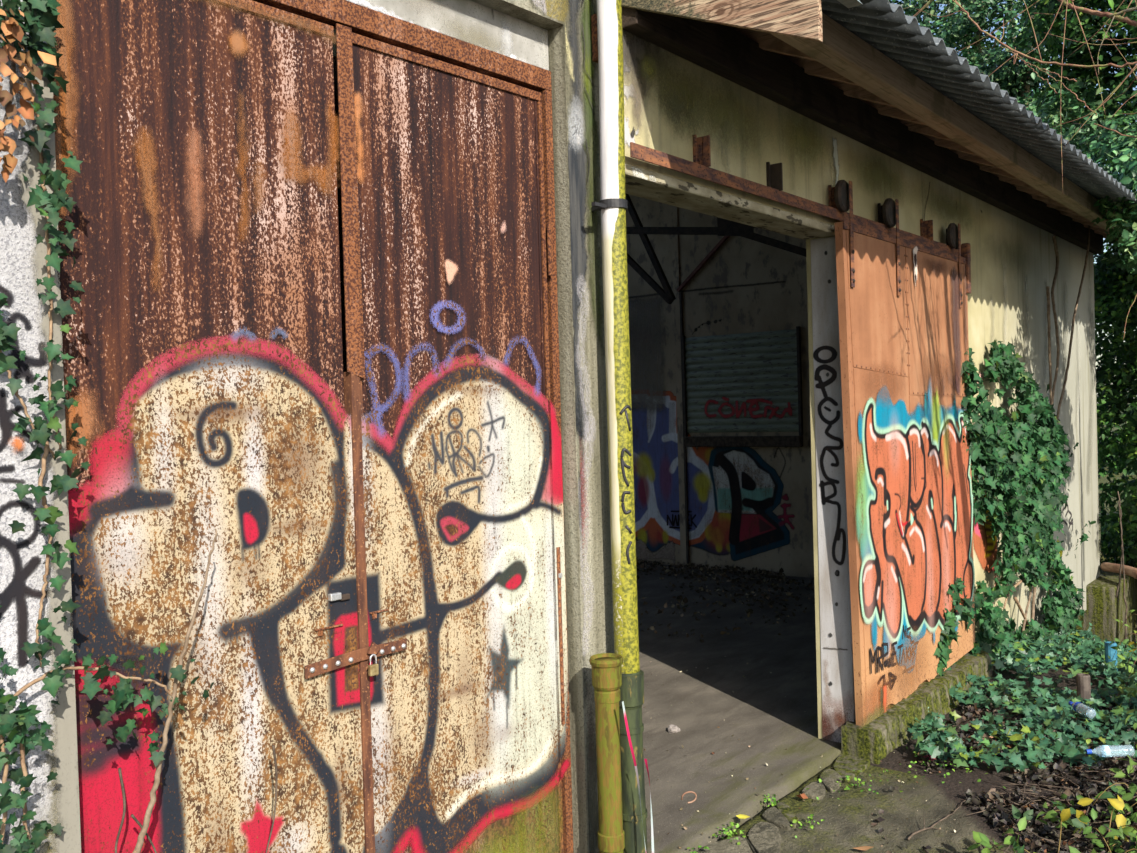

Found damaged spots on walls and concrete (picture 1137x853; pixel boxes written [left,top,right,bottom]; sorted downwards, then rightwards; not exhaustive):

corrosion [53,0,75,174]
corrosion [229,32,248,54]
corrosion [137,130,159,270]
corrosion [189,133,202,228]
corrosion [283,105,338,192]
corrosion [354,93,363,181]
corrosion [445,260,458,283]
corrosion [931,263,967,394]